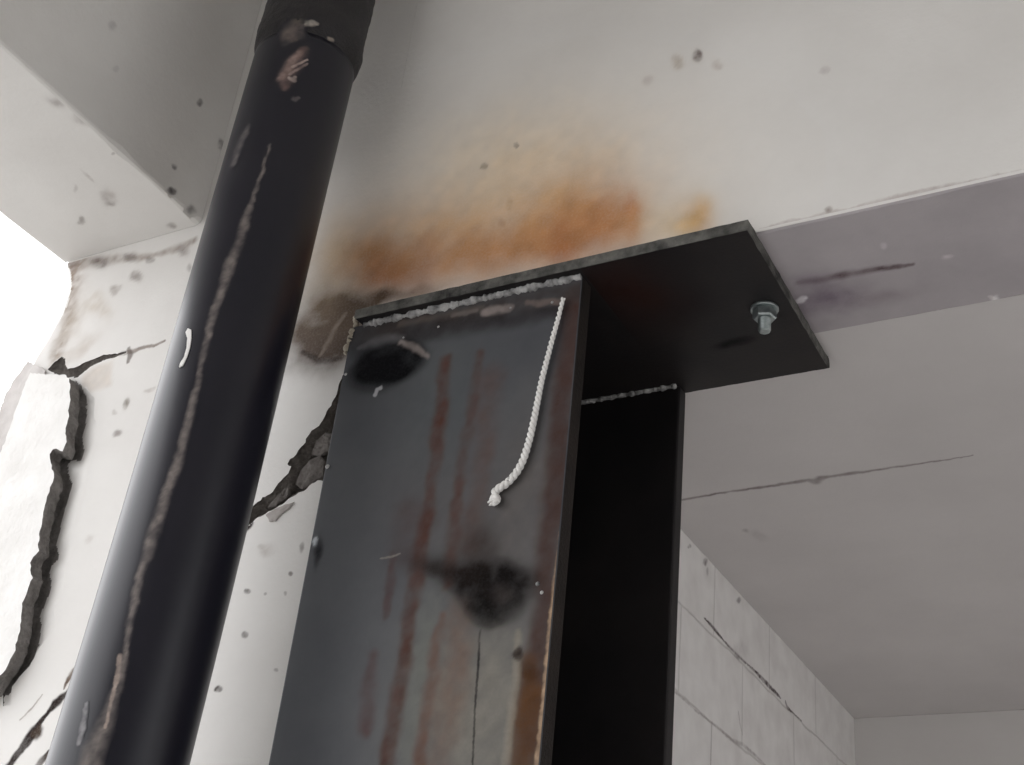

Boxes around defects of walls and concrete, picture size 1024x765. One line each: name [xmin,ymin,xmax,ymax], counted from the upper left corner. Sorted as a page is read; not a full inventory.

corrosion [313,34,827,286]
flaking render [0,361,80,697]
crack [3,338,166,765]
crack [247,378,343,533]
corrosion [374,573,442,765]
corrosion [421,351,456,513]
corrosion [461,356,513,506]
corrosion [508,597,553,765]
corrosion [528,306,579,572]
crack [704,617,728,645]
crack [745,663,802,723]
crack [682,454,974,501]